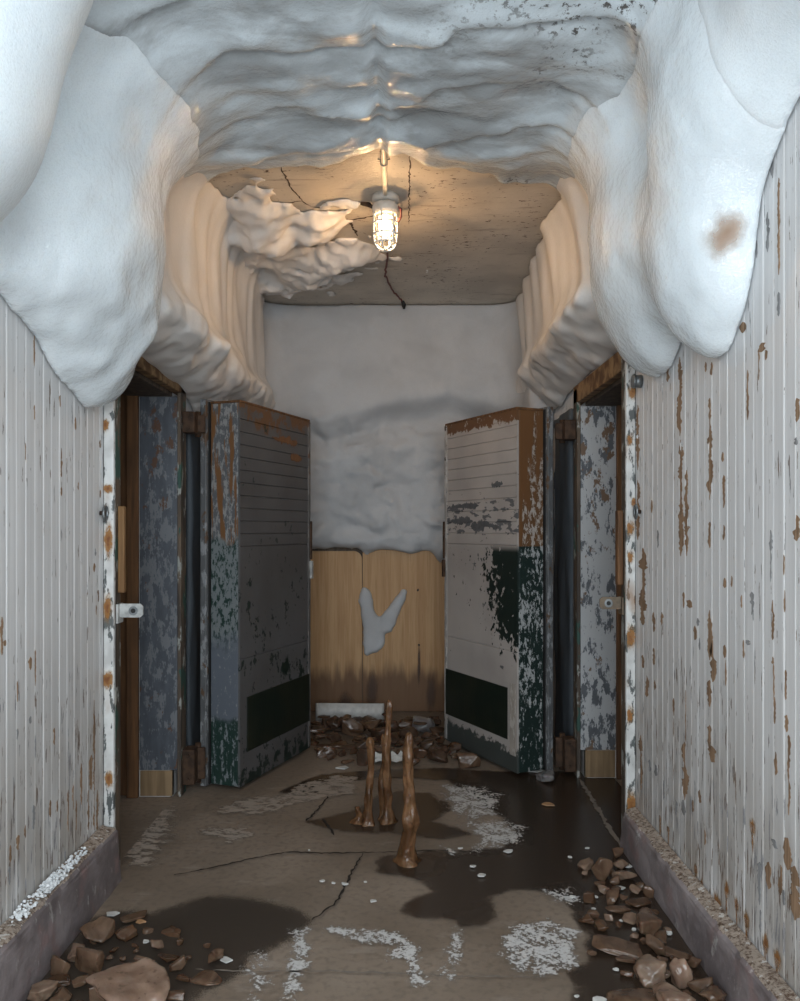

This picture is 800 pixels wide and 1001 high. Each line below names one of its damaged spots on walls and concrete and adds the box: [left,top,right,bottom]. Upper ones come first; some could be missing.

crack [281,167,320,208]
crack [346,216,373,236]
crack [405,156,413,222]
peeling [756,158,780,275]
peeling [666,357,690,556]
peeling [706,398,726,508]
peeling [635,405,664,632]
peeling [693,610,727,707]
crack [174,796,394,920]
water stain [280,768,714,1001]
peeling [757,838,800,932]
water stain [45,895,312,1001]